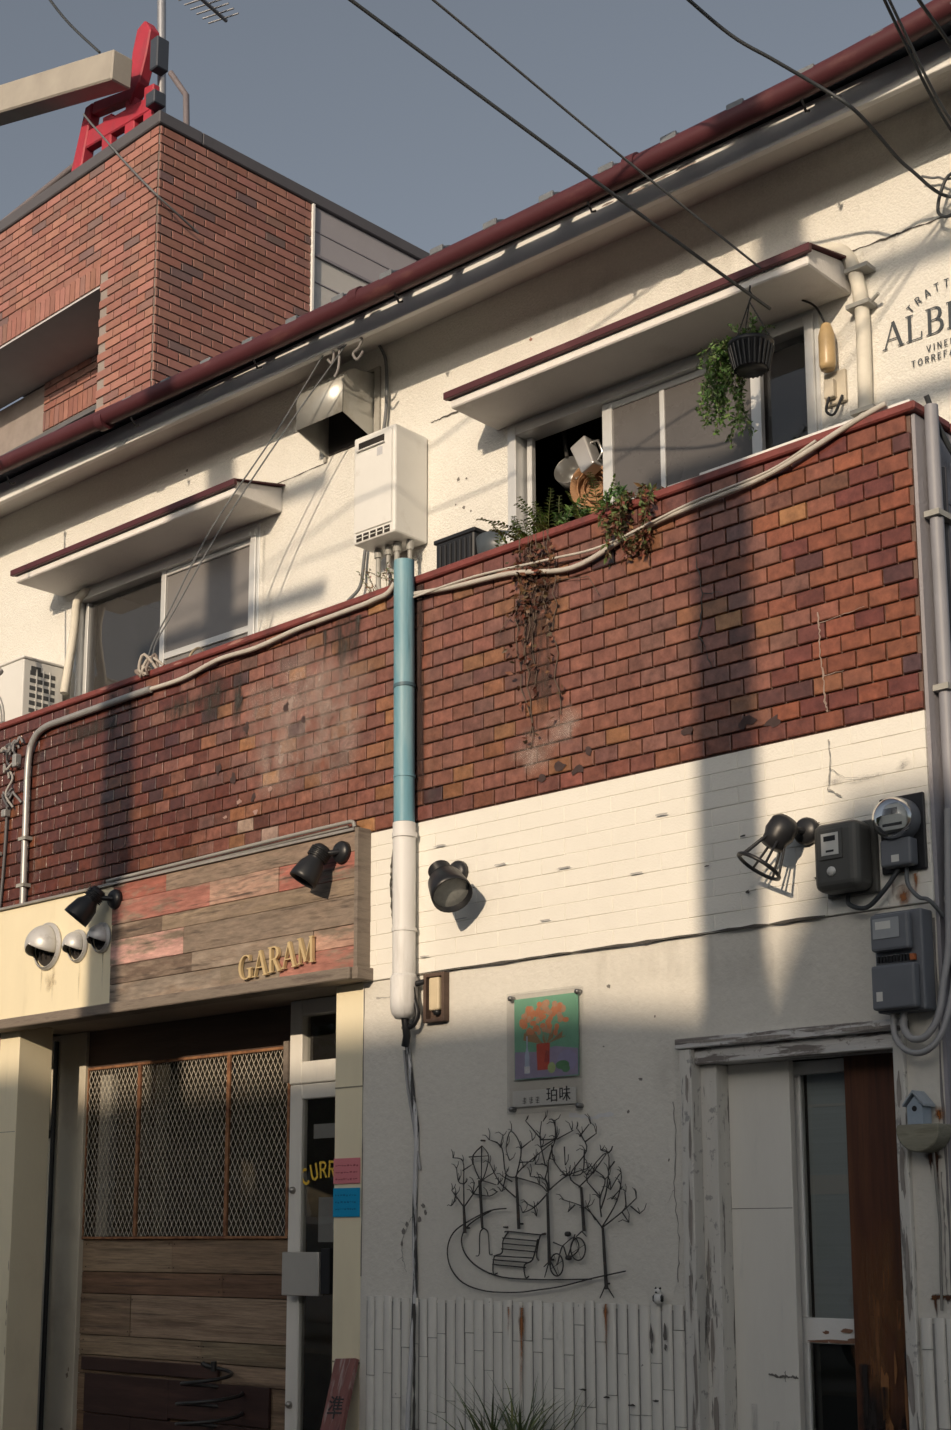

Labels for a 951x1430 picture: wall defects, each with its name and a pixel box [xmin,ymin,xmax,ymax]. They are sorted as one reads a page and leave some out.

rust [508,1307,523,1371]
peeling [688,1182,719,1430]